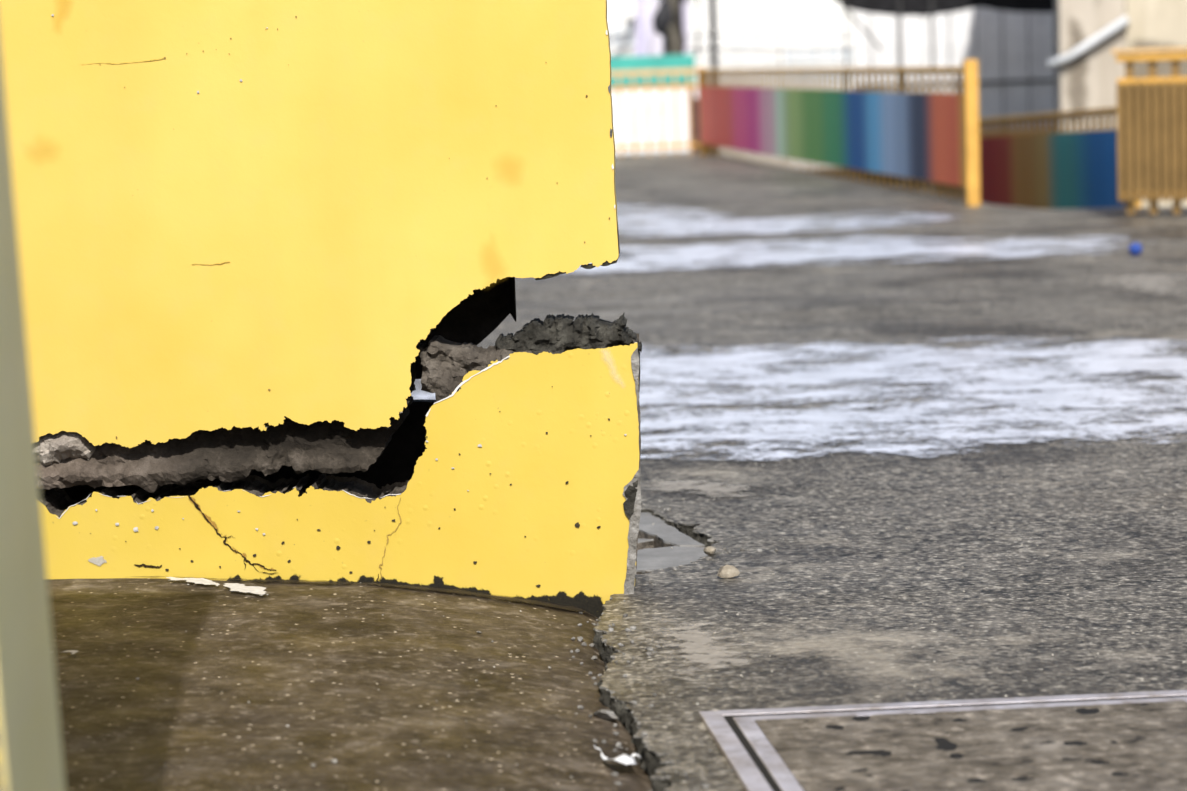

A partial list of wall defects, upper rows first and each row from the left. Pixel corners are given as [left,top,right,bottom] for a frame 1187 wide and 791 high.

crack [35,398,413,581]